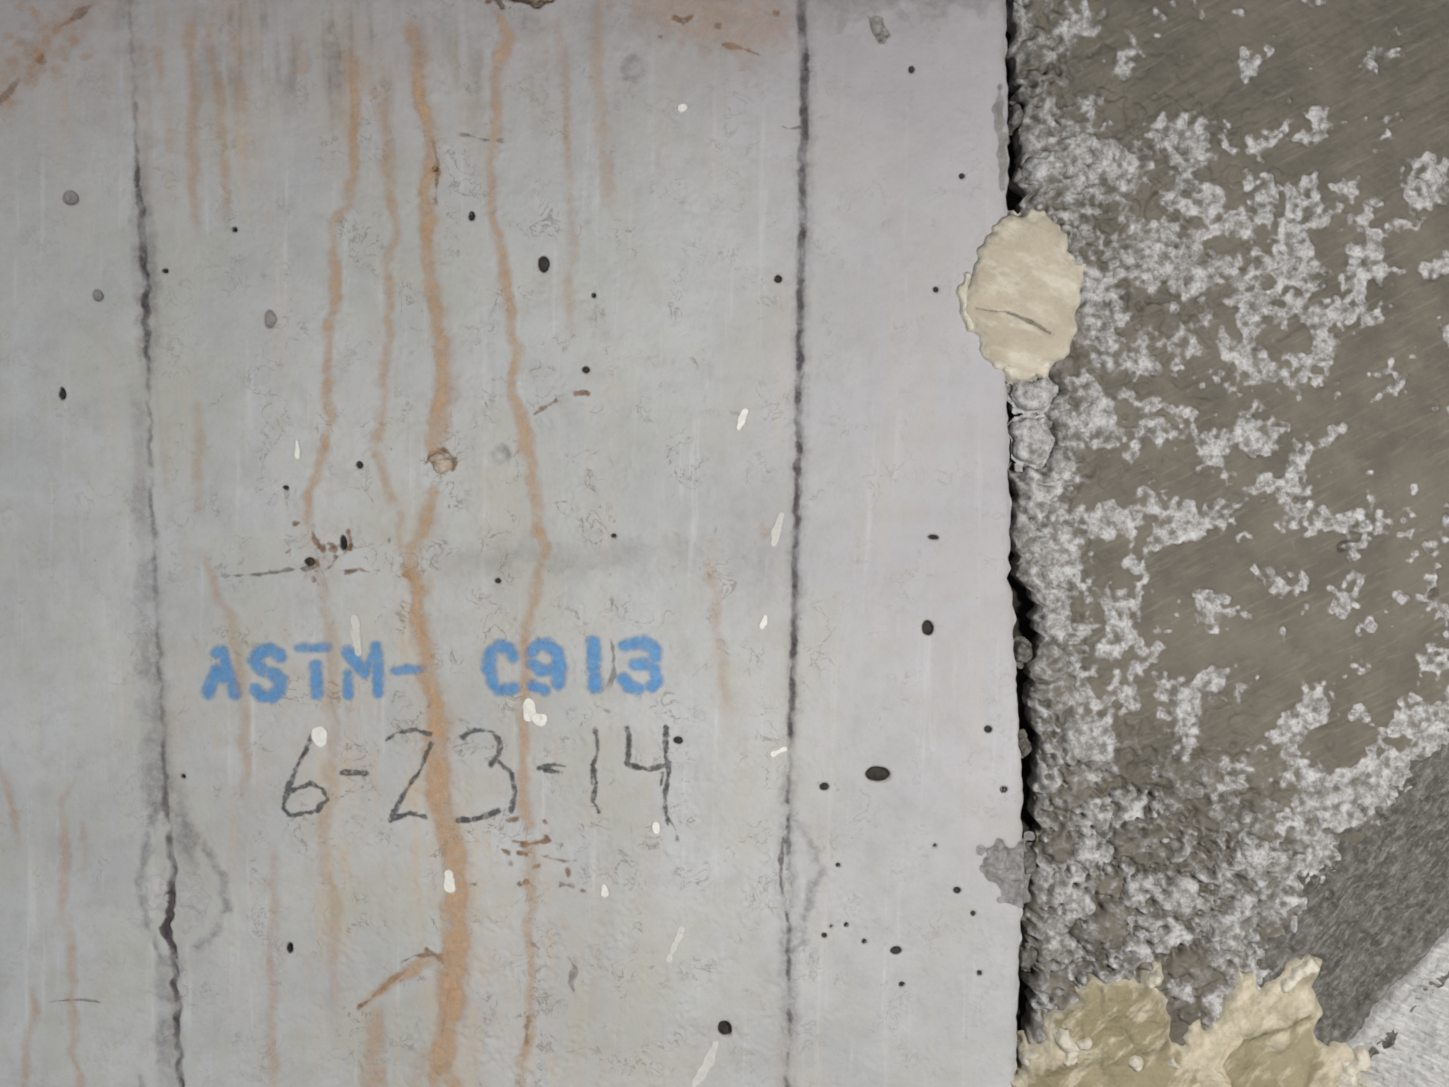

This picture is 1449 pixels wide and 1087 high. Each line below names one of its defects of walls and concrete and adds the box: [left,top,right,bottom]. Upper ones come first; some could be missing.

spalling [486,0,554,9]
crack [135,167,145,214]
crack [798,16,808,242]
crack [140,250,150,358]
crack [795,279,804,404]
corrosion [312,530,353,569]
crack [788,440,802,737]
corrosion [359,570,475,1079]
corrosion [503,721,551,886]
crack [148,794,228,1087]
crack [778,838,805,974]